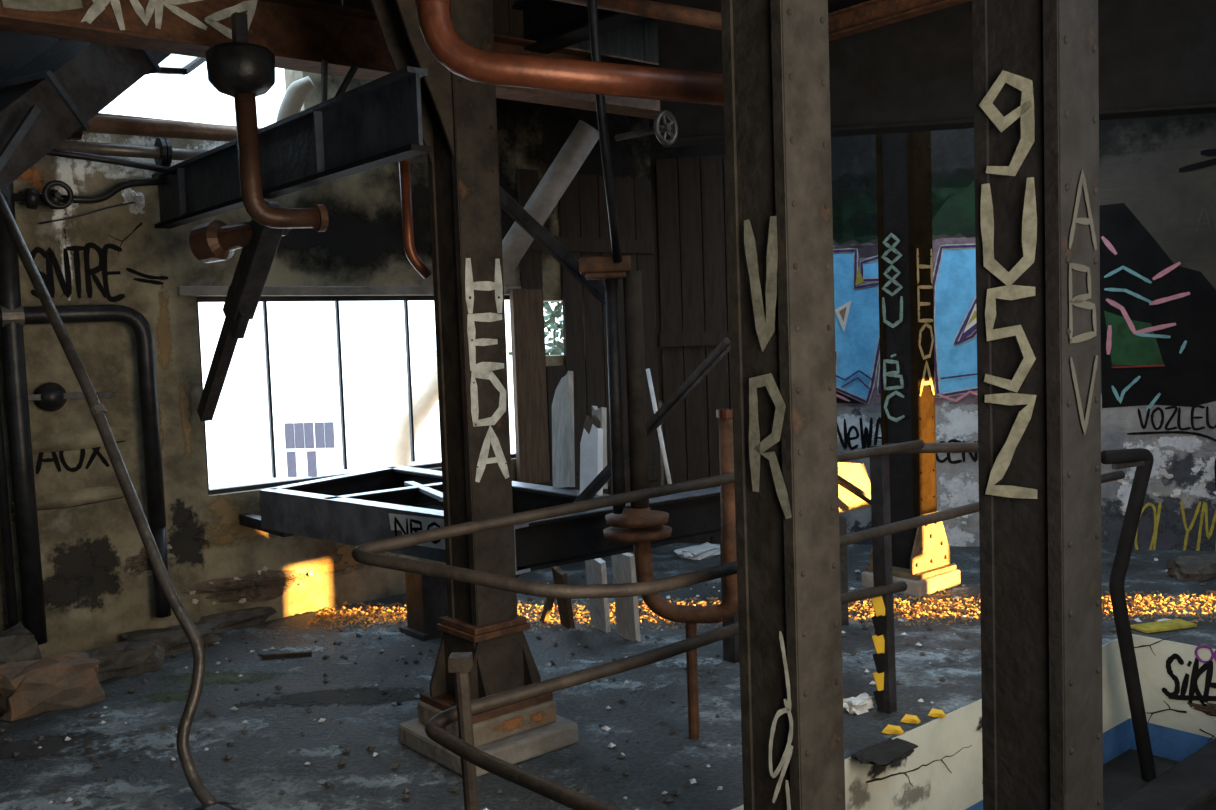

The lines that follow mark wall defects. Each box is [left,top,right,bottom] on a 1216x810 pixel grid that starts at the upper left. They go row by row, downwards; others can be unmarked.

peeling [1101,467,1136,549]
peeling [1121,435,1216,551]
water stain [43,535,123,612]